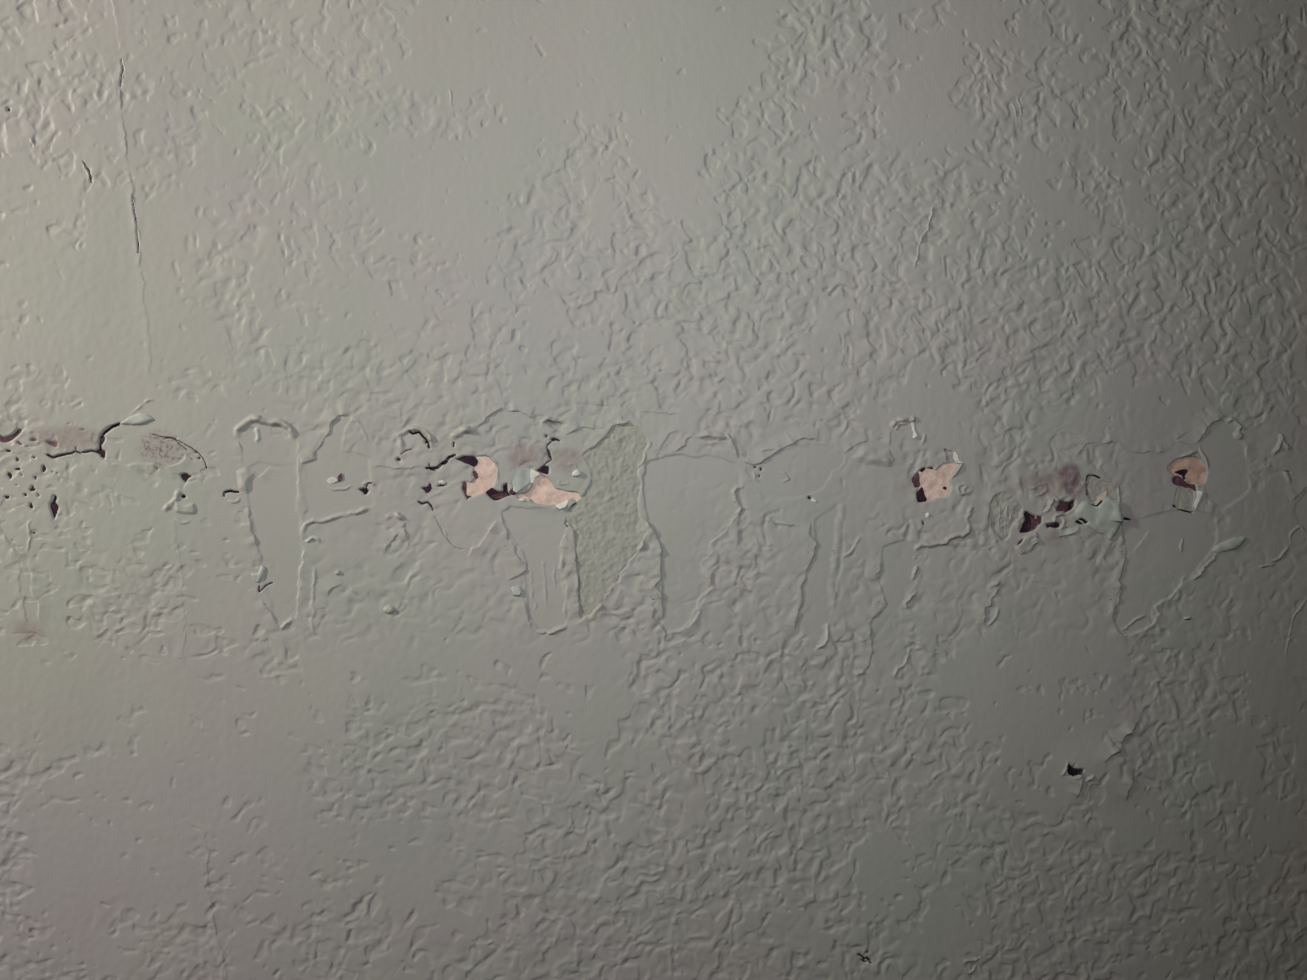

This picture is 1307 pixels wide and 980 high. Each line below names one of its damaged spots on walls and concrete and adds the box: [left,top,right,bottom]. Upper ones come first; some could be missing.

crack [46,0,207,476]
peeling [230,403,376,506]
peeling [449,398,581,514]
peeling [912,449,964,502]
peeling [1014,475,1131,555]
peeling [1168,410,1292,514]